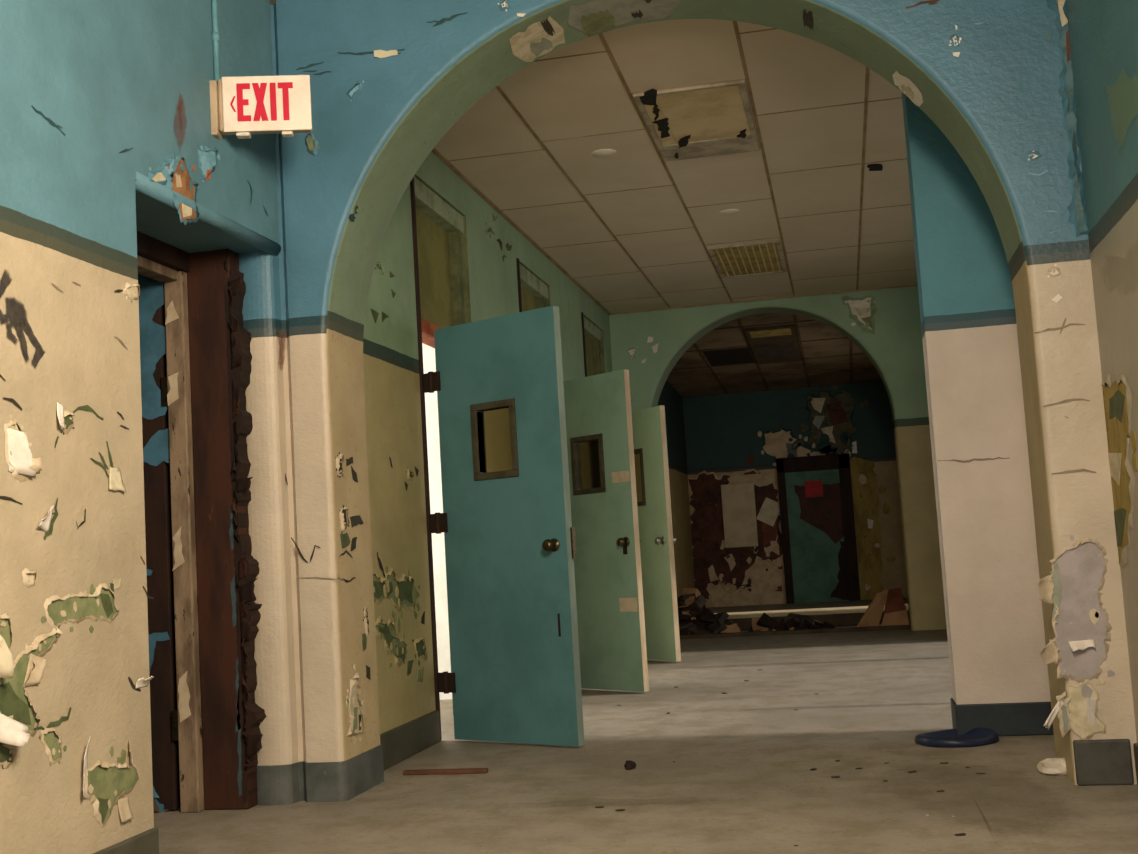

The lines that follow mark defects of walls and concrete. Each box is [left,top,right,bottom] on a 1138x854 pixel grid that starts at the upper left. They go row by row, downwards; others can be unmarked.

spalling [148,145,220,225]
crack [1034,318,1086,334]
peeling [4,415,42,482]
peeling [55,402,104,448]
peeling [688,385,896,607]
crack [938,456,1008,464]
crack [1043,398,1090,418]
crack [1052,467,1096,475]
spalling [1037,372,1137,740]
peeling [0,579,121,769]
peeling [346,566,427,745]
peeling [81,735,139,828]